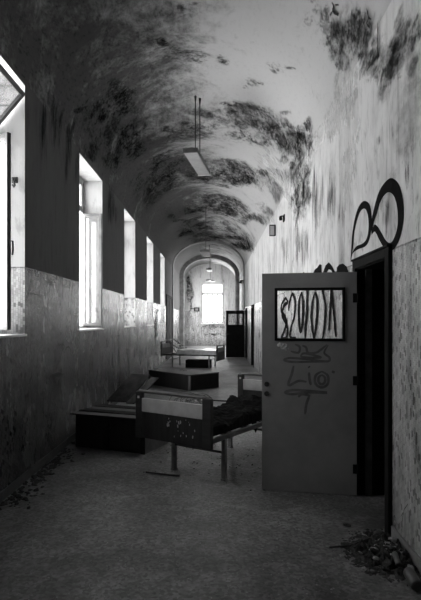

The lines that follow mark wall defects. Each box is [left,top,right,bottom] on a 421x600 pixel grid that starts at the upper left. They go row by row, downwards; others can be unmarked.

leakage [321,9,419,97]
leakage [84,80,146,173]
leakage [186,104,335,217]
leakage [168,194,262,251]